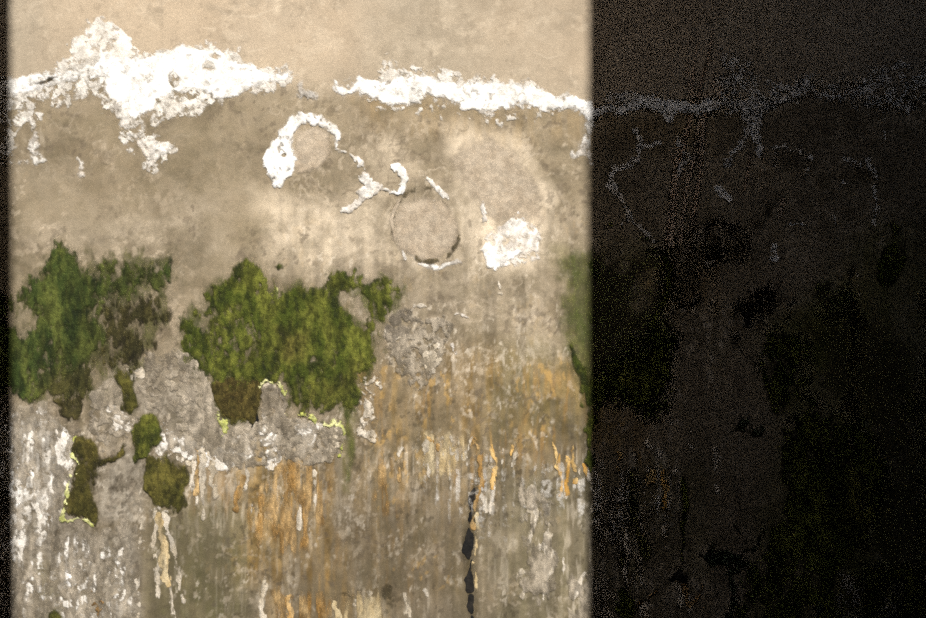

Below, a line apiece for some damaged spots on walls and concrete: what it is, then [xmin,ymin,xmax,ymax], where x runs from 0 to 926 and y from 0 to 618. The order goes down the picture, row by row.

damp [0,16,318,173]
efflorescence [263,112,409,213]
damp [333,47,926,247]
efflorescence [481,211,541,270]
peeling [356,376,382,443]
corrosion [150,509,186,618]
peeling [0,350,346,618]
corrosion [189,438,218,521]
corrosion [232,459,324,554]
corrosion [258,580,381,618]
corrosion [420,432,517,530]
crack [462,488,479,618]